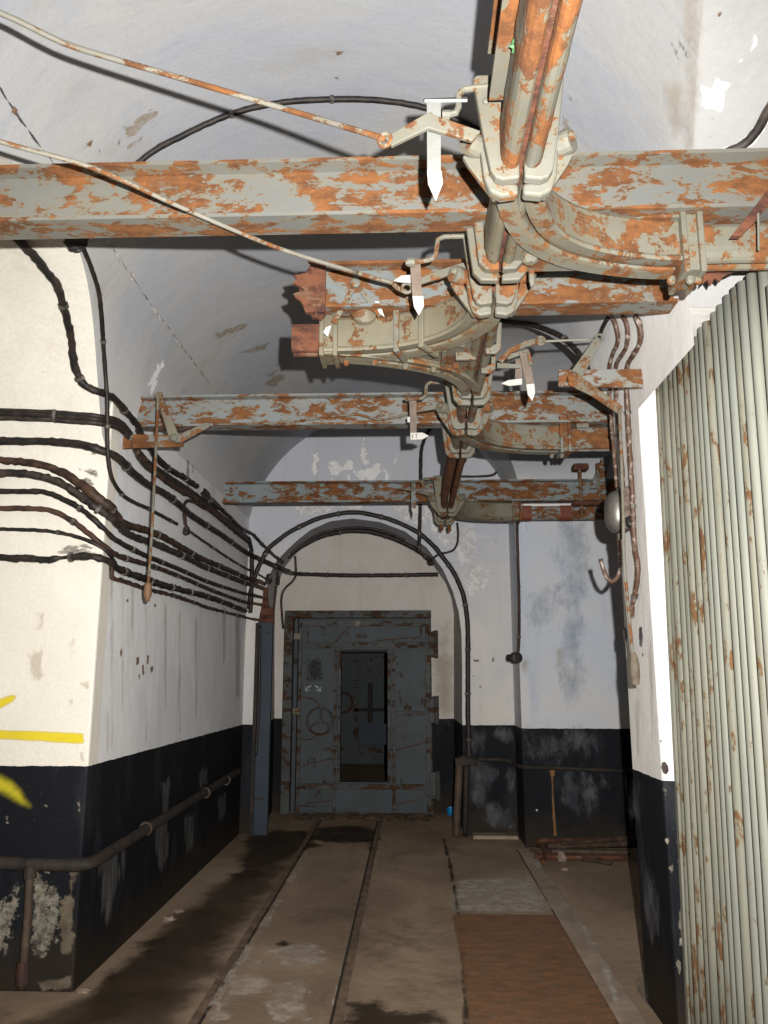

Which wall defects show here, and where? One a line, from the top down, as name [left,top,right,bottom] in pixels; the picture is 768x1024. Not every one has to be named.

peeling [700,77,731,112]
peeling [310,437,397,481]
peeling [0,885,19,956]
peeling [30,871,78,958]
leakage [30,826,379,1024]